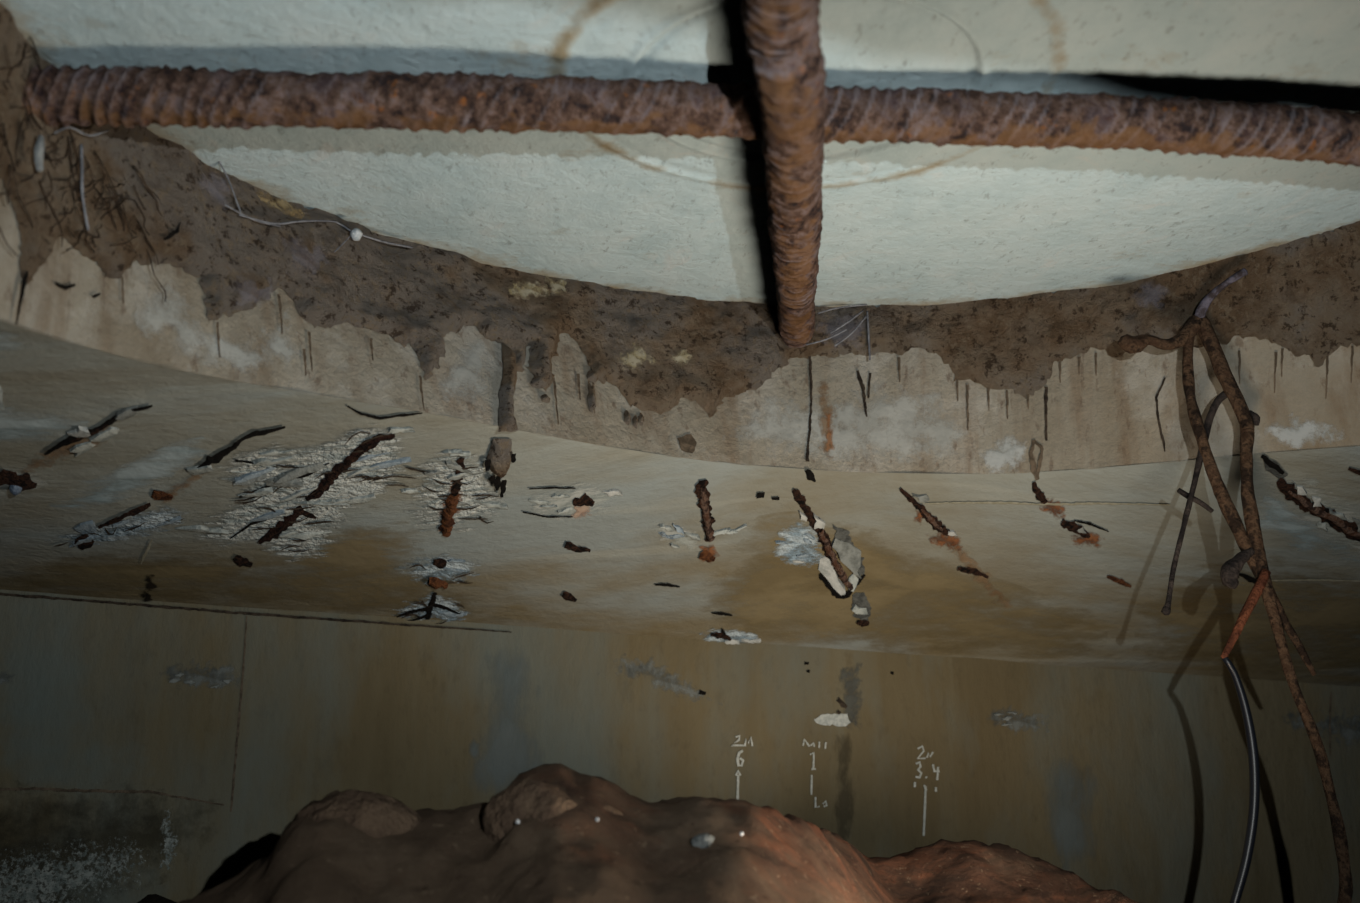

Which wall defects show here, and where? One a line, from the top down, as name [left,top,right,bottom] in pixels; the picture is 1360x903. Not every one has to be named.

spalling [56,424,623,568]
spalling [397,554,481,624]
leakage [0,805,178,903]